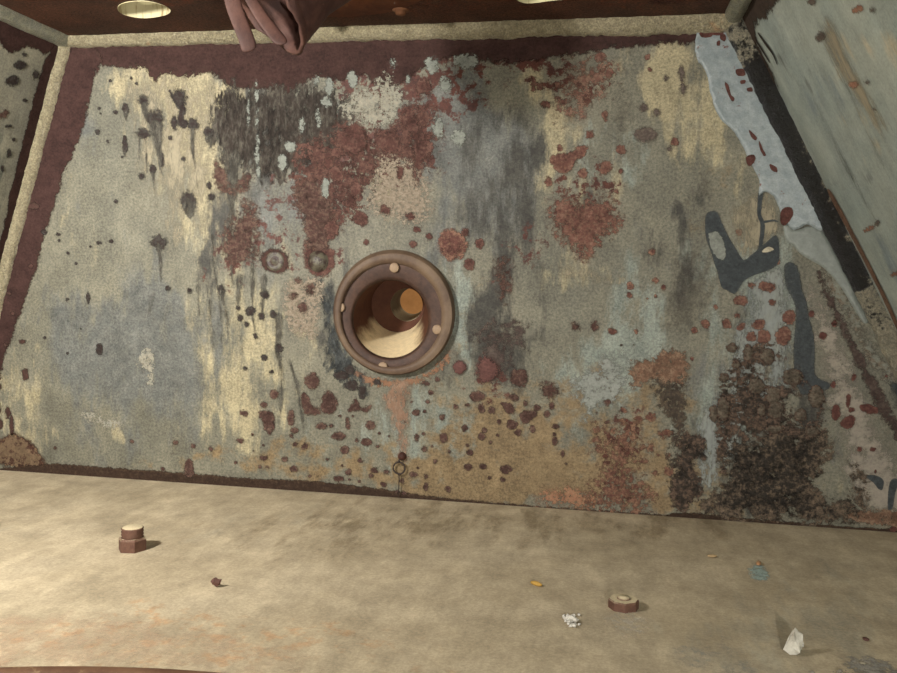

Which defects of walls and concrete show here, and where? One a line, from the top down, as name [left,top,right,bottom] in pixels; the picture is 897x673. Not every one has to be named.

rust [0,21,696,391]
peeling [695,32,897,512]
rust [183,459,195,478]
rust [240,390,279,435]
rust [287,350,452,495]
rust [464,443,513,482]
rust [439,369,567,465]
rust [535,267,897,532]